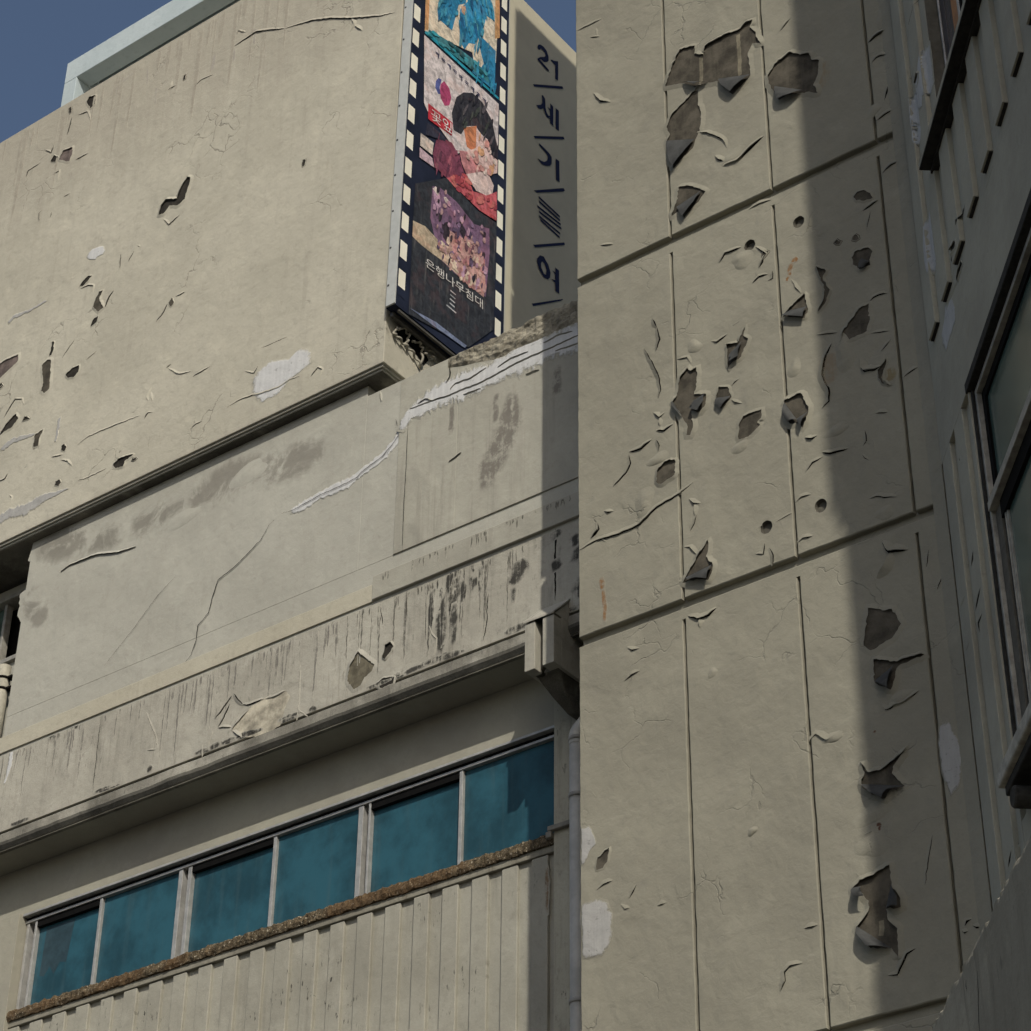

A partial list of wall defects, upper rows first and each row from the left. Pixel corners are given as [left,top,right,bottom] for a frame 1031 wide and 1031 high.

crack [234,12,394,46]
peeling [663,17,824,223]
peeling [156,175,194,218]
peeling [39,341,81,396]
damp [290,323,578,514]
spalling [448,299,578,368]
peeling [669,364,734,440]
damp [503,545,531,637]
damp [548,529,579,613]
peeling [859,603,930,695]
damp [194,728,263,757]
peeling [848,860,908,960]